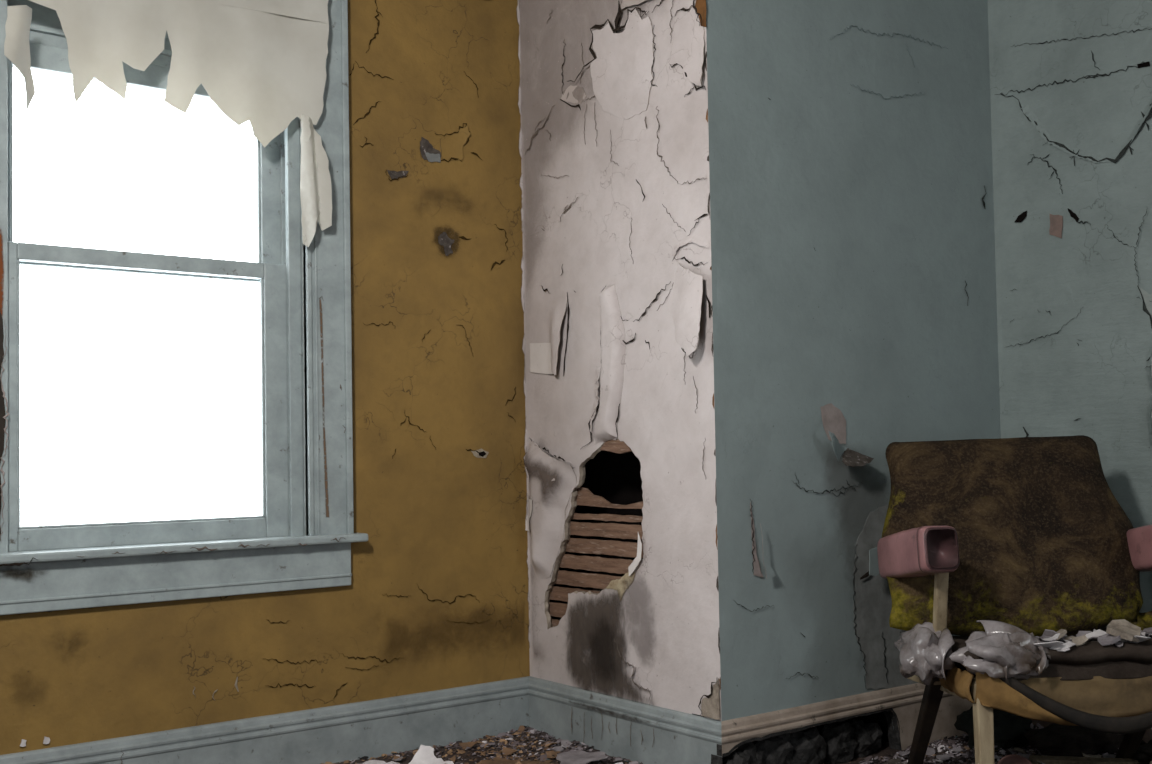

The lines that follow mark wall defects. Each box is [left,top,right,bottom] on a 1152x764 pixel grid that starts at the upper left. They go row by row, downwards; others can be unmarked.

spalling [420,123,483,163]
crack [541,175,578,230]
peeling [560,0,707,120]
crack [584,105,707,254]
crack [994,28,1152,194]
crack [542,264,673,448]
spalling [1134,211,1152,448]
peeling [821,403,874,467]
spalling [544,438,644,629]